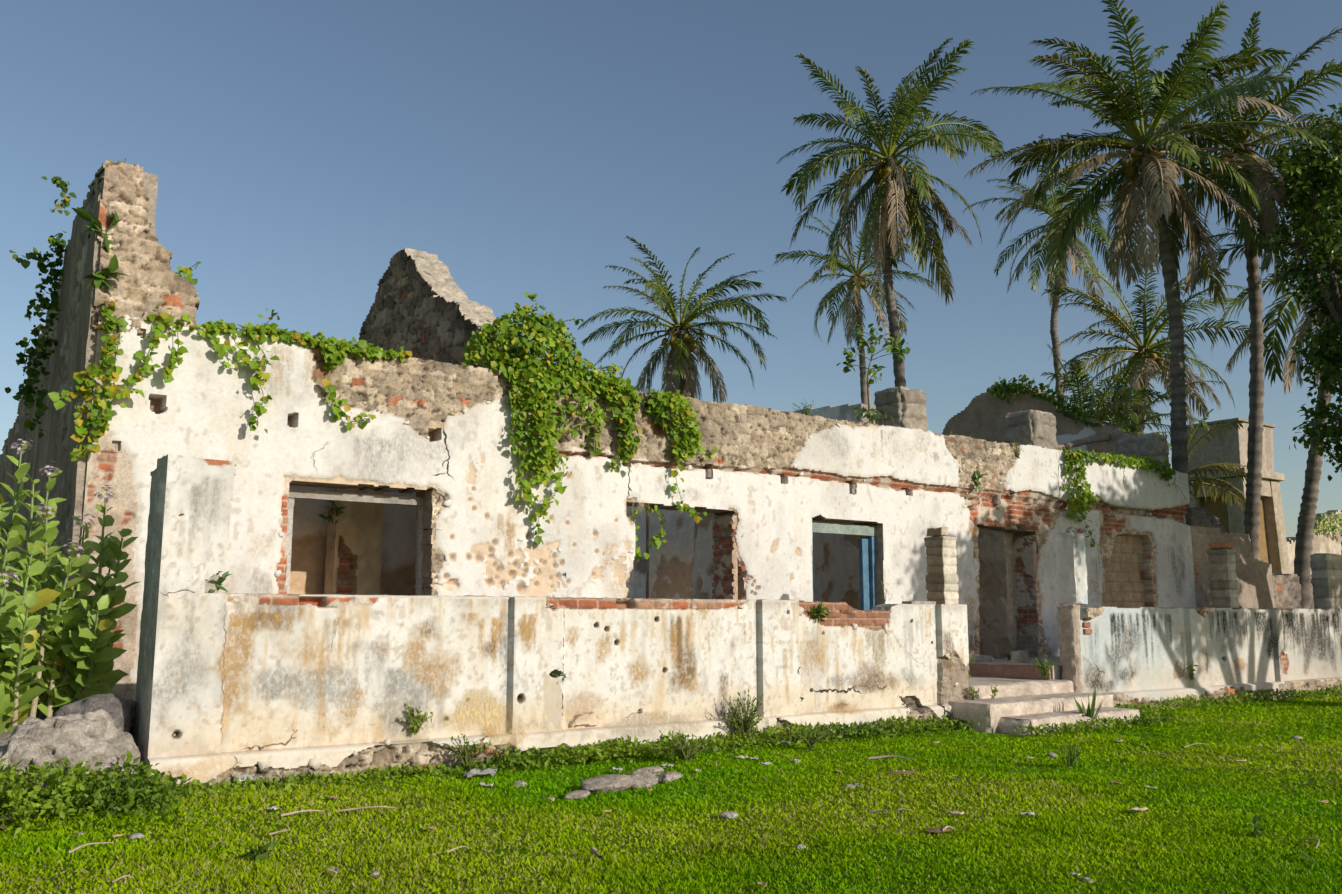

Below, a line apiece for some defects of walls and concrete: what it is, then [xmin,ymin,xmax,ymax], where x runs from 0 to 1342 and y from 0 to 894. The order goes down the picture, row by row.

spalling [311,346,881,476]
crack [429,426,454,501]
water stain [451,691,525,745]
spalling [227,474,761,610]
water stain [543,671,600,729]
spalling [799,601,891,634]
water stain [834,663,890,691]
spalling [878,430,1062,734]
peeling [1082,511,1160,634]
water stain [1086,614,1171,688]
water stain [1212,611,1342,670]
spalling [172,739,625,791]